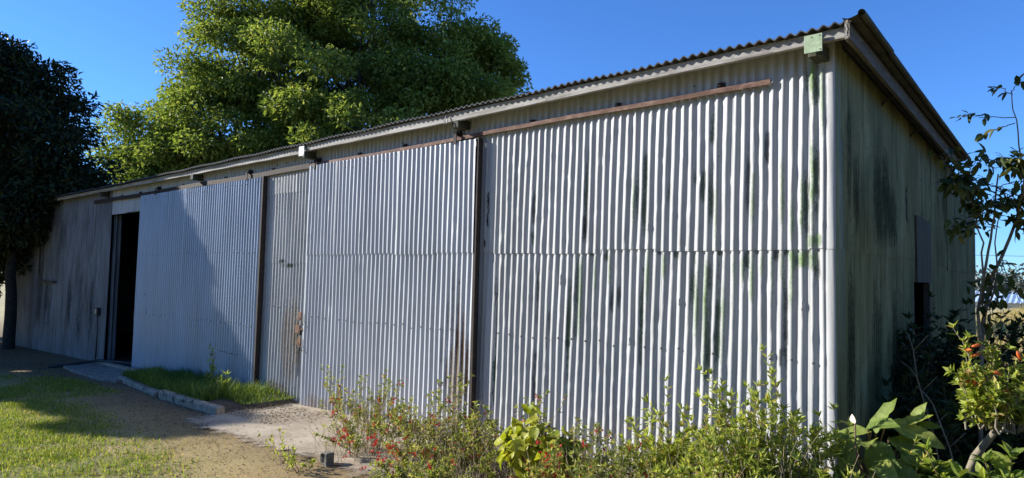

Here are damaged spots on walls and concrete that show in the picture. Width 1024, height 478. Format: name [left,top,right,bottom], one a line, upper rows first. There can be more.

leakage [806,61,824,121]
leakage [780,147,819,237]
corrosion [446,282,469,411]
leakage [639,258,665,365]
leakage [690,254,724,379]
leakage [779,255,795,367]
leakage [848,304,856,418]